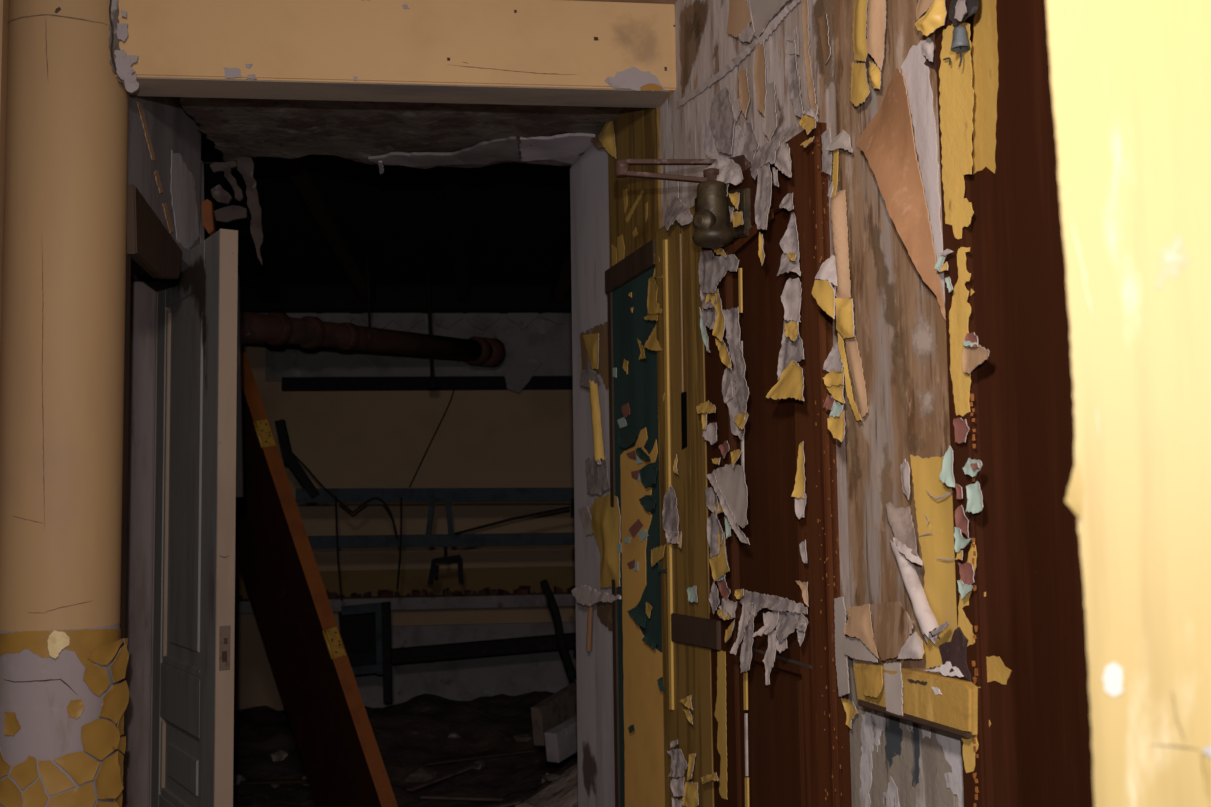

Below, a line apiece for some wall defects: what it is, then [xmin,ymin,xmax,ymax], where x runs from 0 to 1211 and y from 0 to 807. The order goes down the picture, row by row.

crack [9,0,139,93]
peeling [664,181,693,230]
peeling [677,0,999,685]
peeling [571,254,683,651]
crack [4,679,78,695]
peeling [0,628,129,807]
peeling [679,695,693,725]
peeling [834,596,979,807]
peeling [986,656,1012,685]
peeling [667,739,719,807]